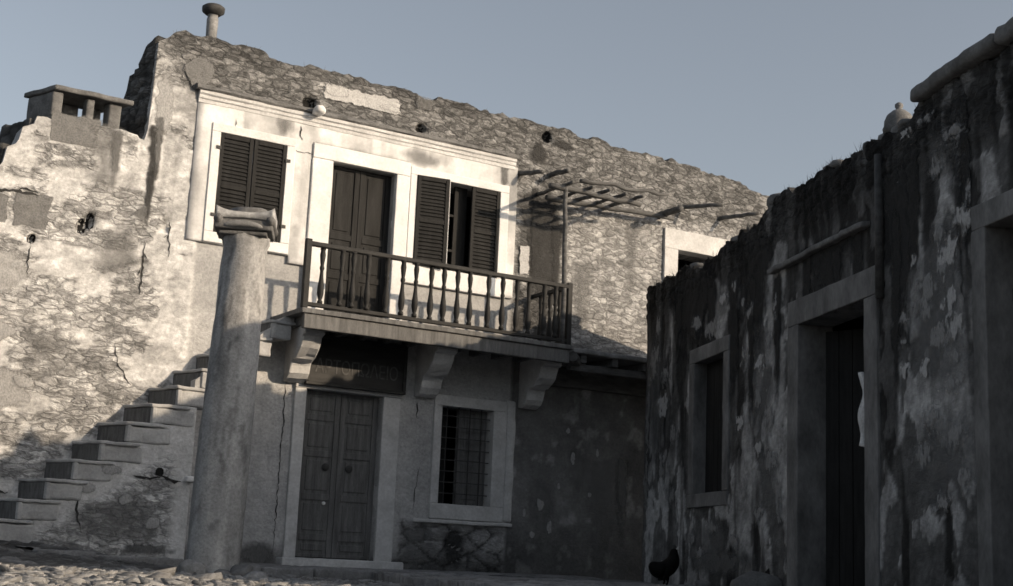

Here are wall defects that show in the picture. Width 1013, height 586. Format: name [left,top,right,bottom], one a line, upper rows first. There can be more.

peeling [943,123,966,156]
leakage [943,92,971,243]
crack [138,222,171,294]
crack [272,387,286,551]
peeling [643,316,680,510]
leakage [672,265,717,355]
peeling [692,281,753,338]
leakage [727,237,781,413]
peeling [740,293,777,431]
leakage [801,226,863,297]
leakage [881,133,920,398]
peeling [900,181,971,394]